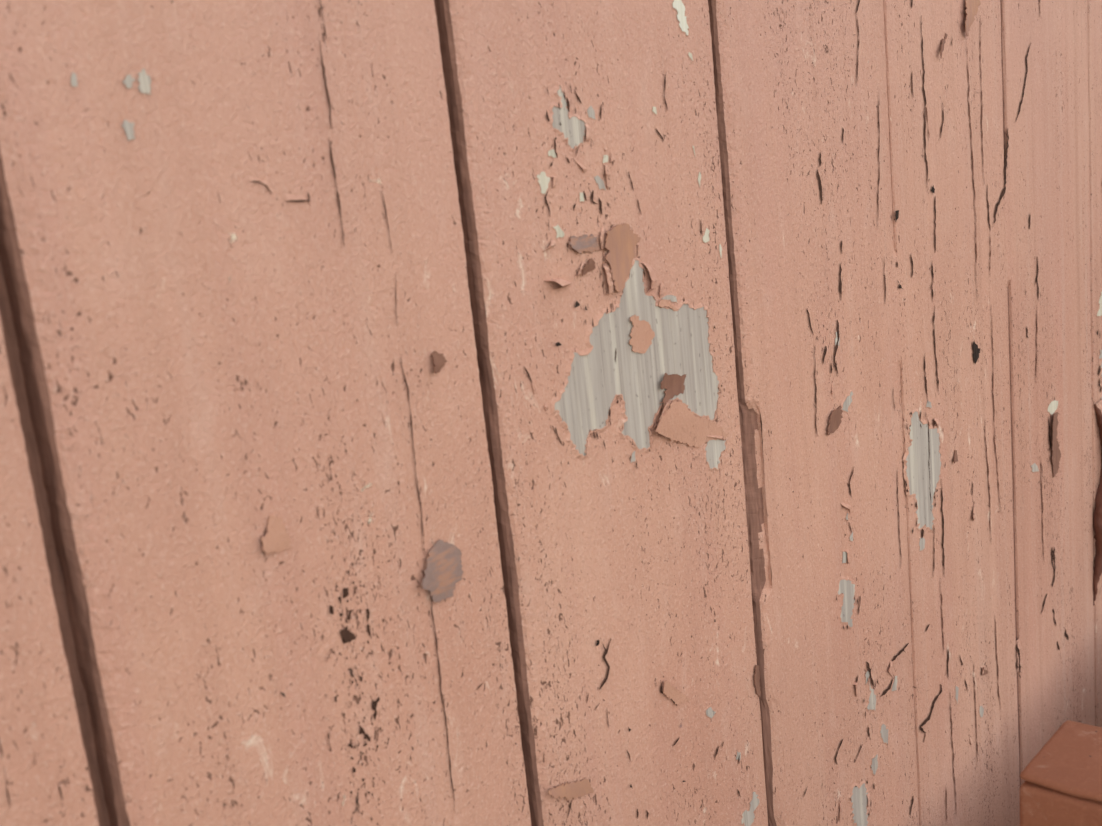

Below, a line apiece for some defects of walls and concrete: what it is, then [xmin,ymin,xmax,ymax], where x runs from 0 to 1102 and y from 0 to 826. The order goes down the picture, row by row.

peeling [120,67,152,96]
peeling [546,81,615,192]
peeling [535,170,558,196]
peeling [701,227,722,259]
peeling [550,244,728,472]
peeling [896,399,958,552]
peeling [421,540,464,603]